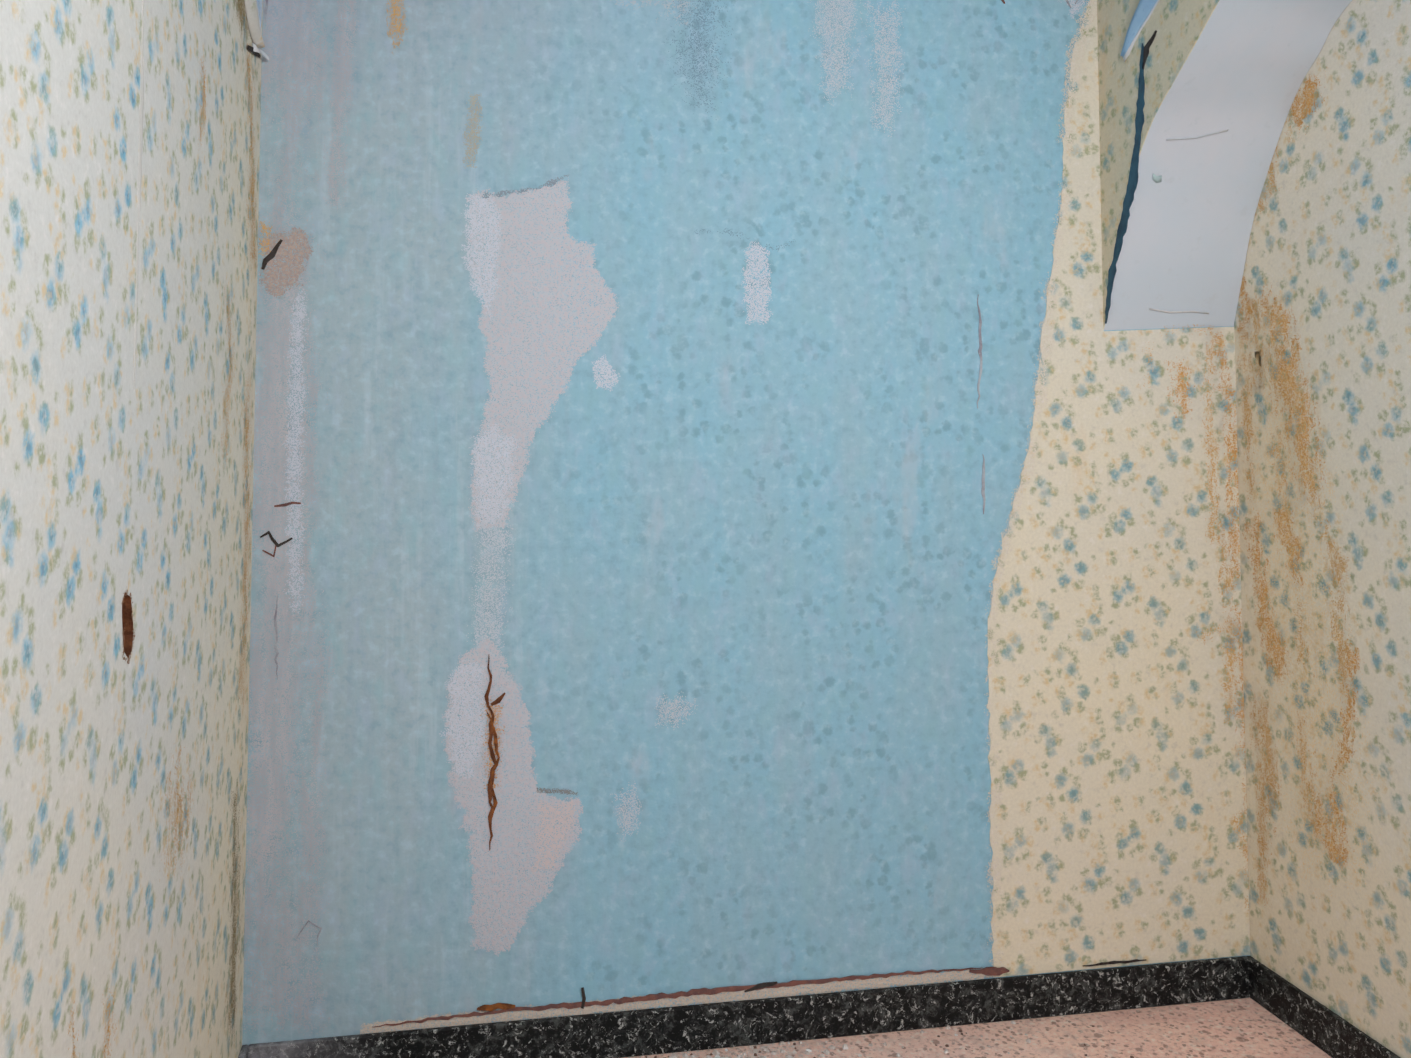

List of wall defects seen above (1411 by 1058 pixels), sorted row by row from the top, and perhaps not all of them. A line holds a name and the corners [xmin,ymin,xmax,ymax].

flaking render [258,221,314,299]
peeling [694,228,794,325]
peeling [439,175,620,956]
spalling [121,589,135,663]
crack [480,658,508,851]
flaking render [360,967,1009,1034]
flaking render [1083,959,1146,967]